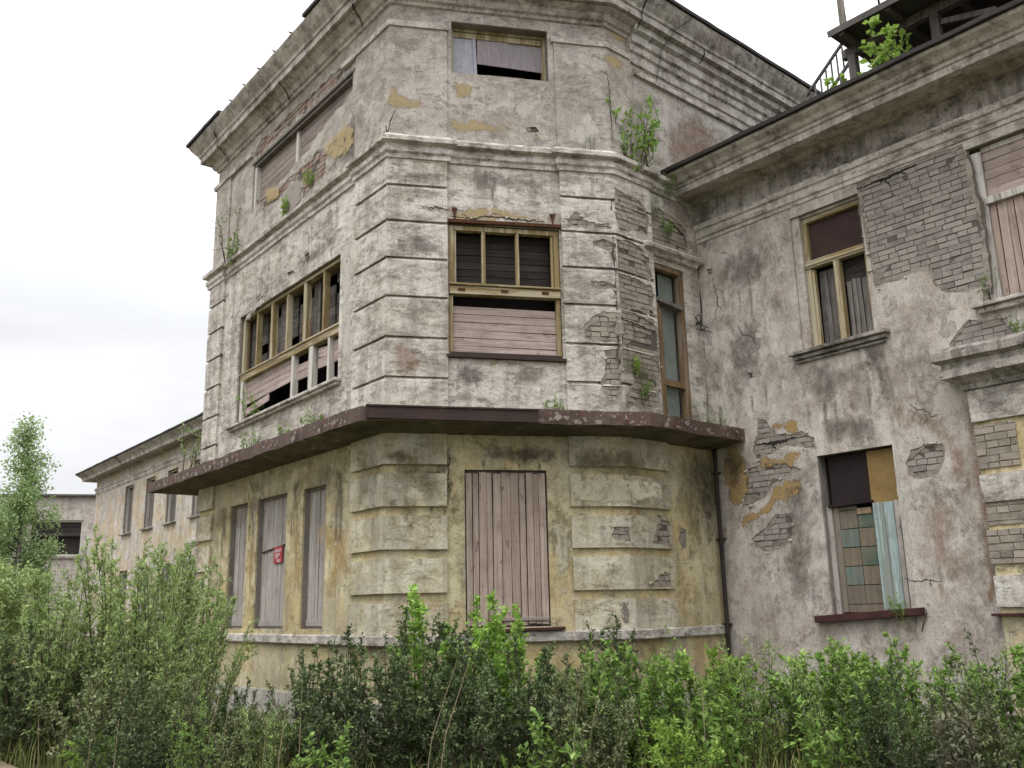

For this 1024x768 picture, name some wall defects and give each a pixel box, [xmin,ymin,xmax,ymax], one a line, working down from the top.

spalling [254,65,352,159]
peeling [388,87,420,108]
peeling [445,82,546,138]
spalling [256,122,354,212]
peeling [456,207,539,221]
spalling [856,144,994,294]
spalling [547,188,689,424]
spalling [665,367,816,554]
spalling [610,524,634,580]
spalling [649,571,671,590]
spalling [653,514,687,550]
spalling [897,441,945,597]